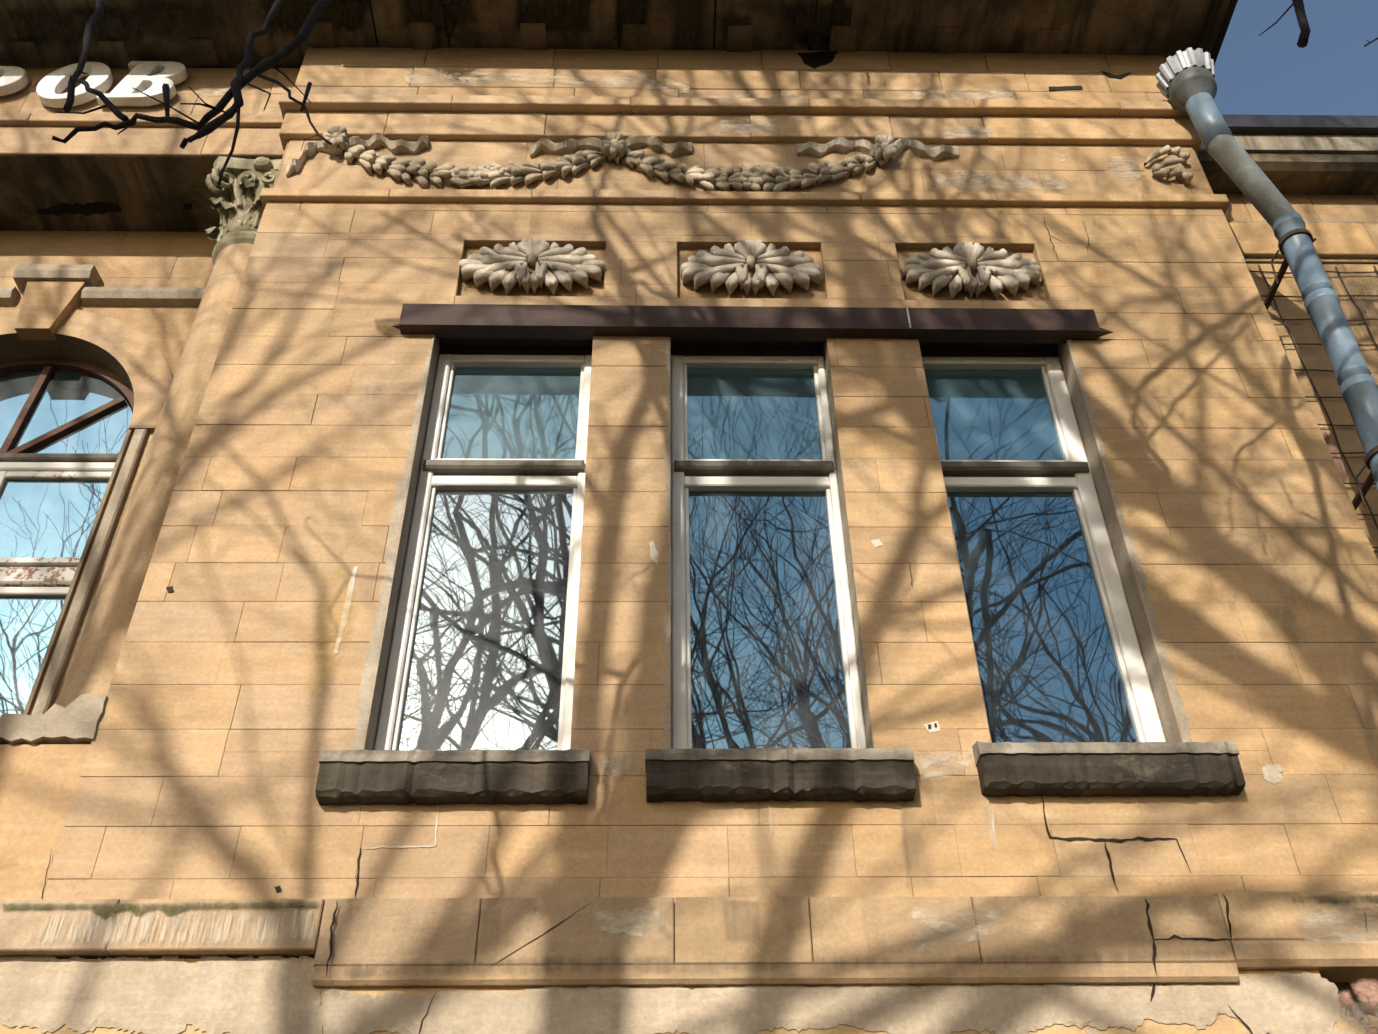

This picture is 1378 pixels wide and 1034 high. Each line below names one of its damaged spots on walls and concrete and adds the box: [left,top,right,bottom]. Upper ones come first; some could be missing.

crack [326,804,438,977]
crack [1041,796,1232,1002]
crack [490,900,594,967]
crack [1227,1004,1269,1034]
spalling [1339,980,1378,1006]